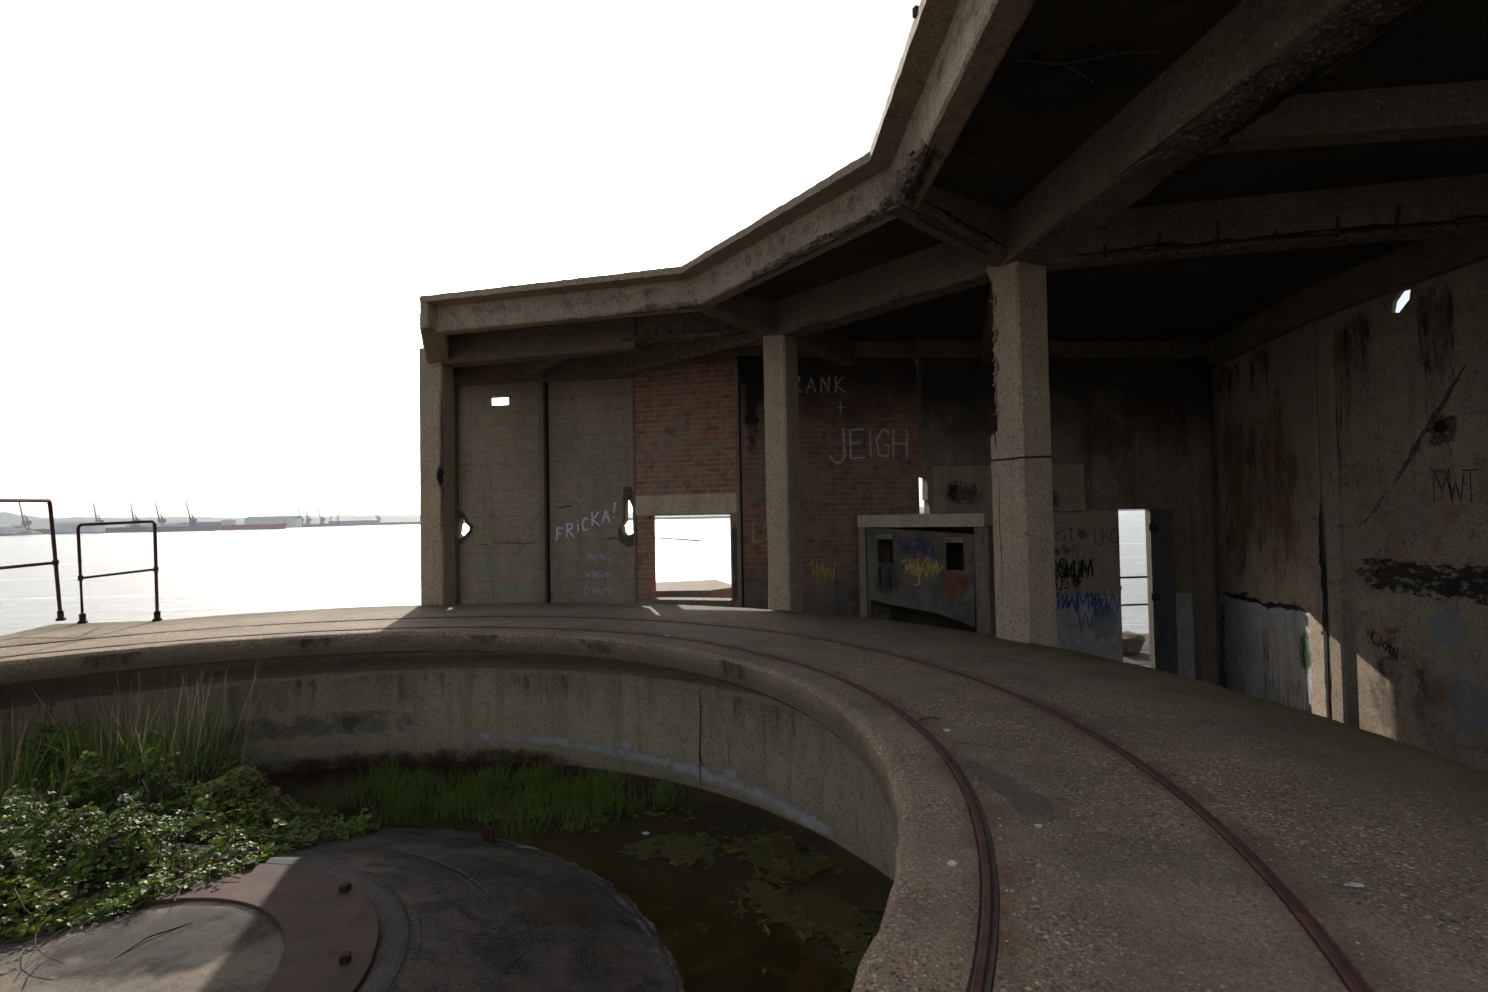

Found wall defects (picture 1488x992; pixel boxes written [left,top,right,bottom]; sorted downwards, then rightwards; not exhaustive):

spalling [739,139,943,287]
crack [1357,363,1466,530]
crack [1221,503,1336,718]
crack [699,693,730,785]